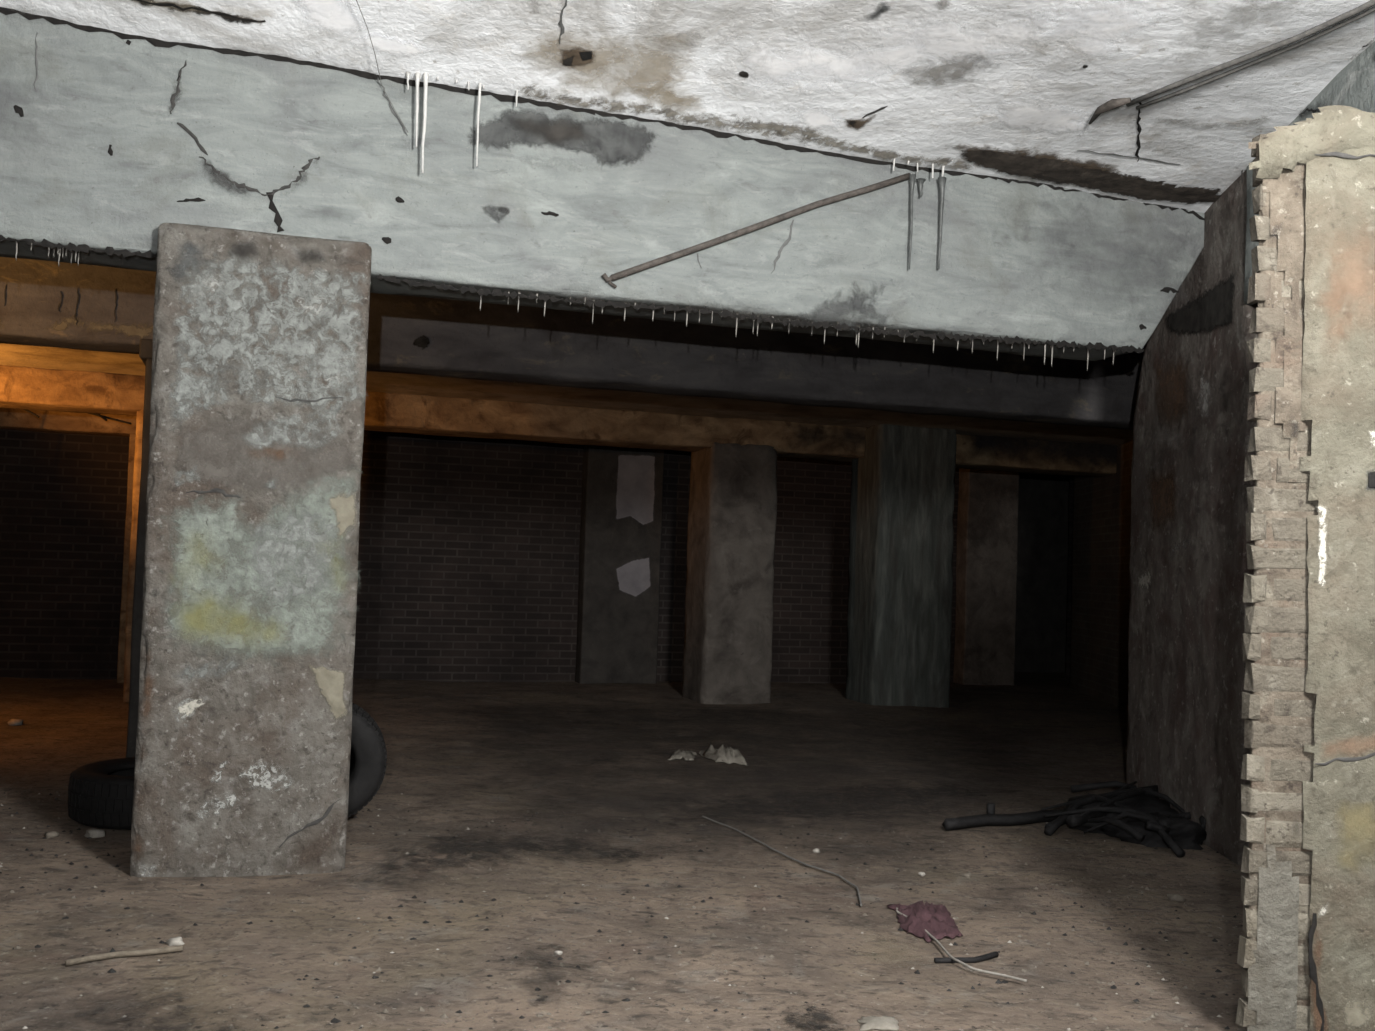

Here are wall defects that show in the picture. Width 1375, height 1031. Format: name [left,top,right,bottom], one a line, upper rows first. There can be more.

leakage [530,39,696,106]
crack [170,61,320,232]
leakage [470,109,655,169]
crack [1308,913,1327,1031]